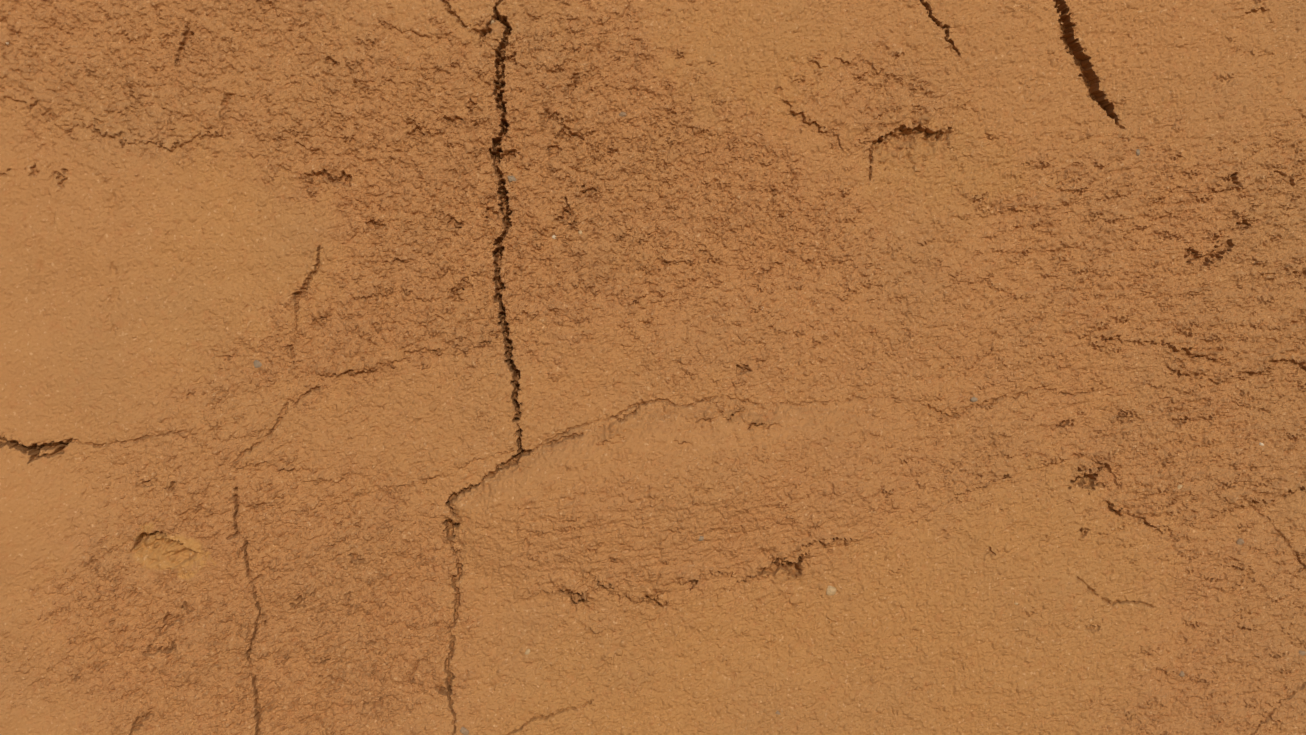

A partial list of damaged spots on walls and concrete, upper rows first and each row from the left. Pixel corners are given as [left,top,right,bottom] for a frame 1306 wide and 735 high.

crack [1053,0,1128,131]
crack [0,429,189,464]
crack [224,243,322,735]
crack [405,0,1112,735]